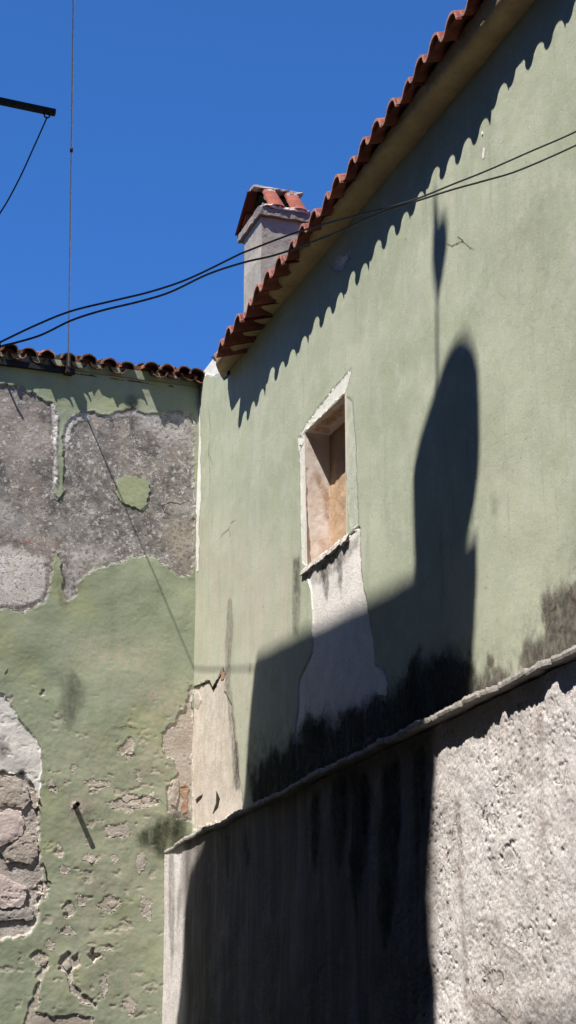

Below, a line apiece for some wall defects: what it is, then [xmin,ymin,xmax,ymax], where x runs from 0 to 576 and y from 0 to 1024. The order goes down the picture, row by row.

peeling [0,383,201,614]
flaking render [0,693,70,941]
peeling [69,668,243,864]
water stain [236,581,576,804]
flaking render [24,895,124,1024]